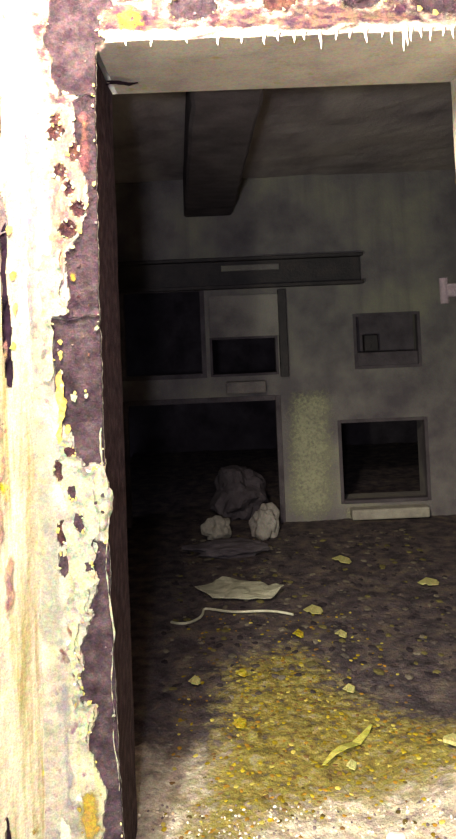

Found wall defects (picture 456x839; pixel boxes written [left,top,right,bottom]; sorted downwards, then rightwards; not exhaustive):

spalling [160,0,228,29]
rust [96,0,426,32]
spalling [257,0,296,19]
spalling [333,0,389,16]
spalling [404,0,456,23]
damp [149,27,243,47]
damp [380,24,455,50]
rust [46,103,89,268]
crack [0,194,18,388]
spalling [30,0,124,839]
crack [4,817,12,839]